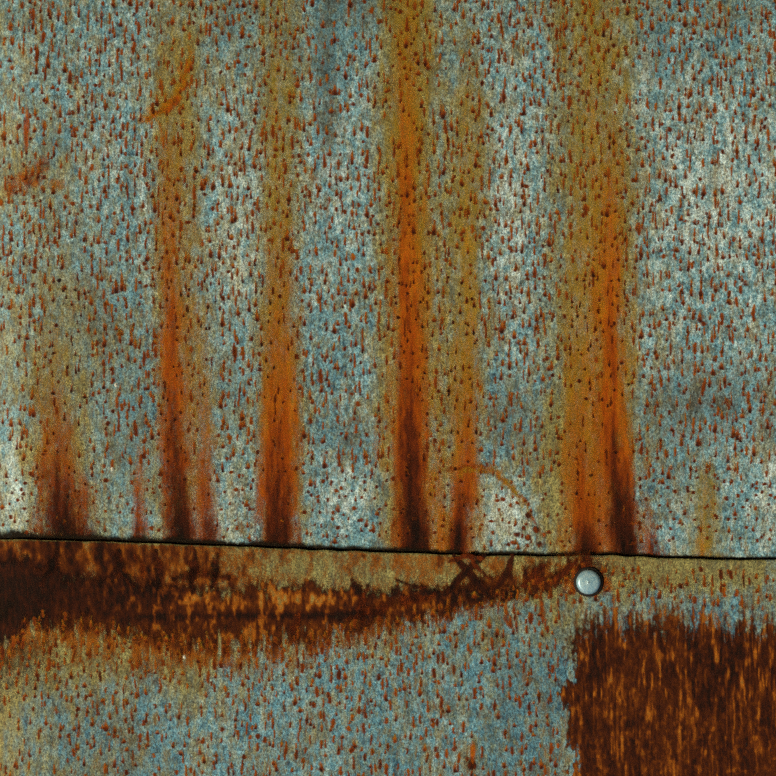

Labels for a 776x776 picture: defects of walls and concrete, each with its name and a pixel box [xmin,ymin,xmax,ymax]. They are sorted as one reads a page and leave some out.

corrosion [336,32,382,80]
corrosion [356,71,376,109]
corrosion [611,0,776,224]
corrosion [643,266,671,292]
corrosion [676,185,776,338]
corrosion [50,371,66,422]
corrosion [336,353,376,440]
corrosion [1,399,32,461]
corrosion [656,324,776,557]
corrosion [314,506,349,544]